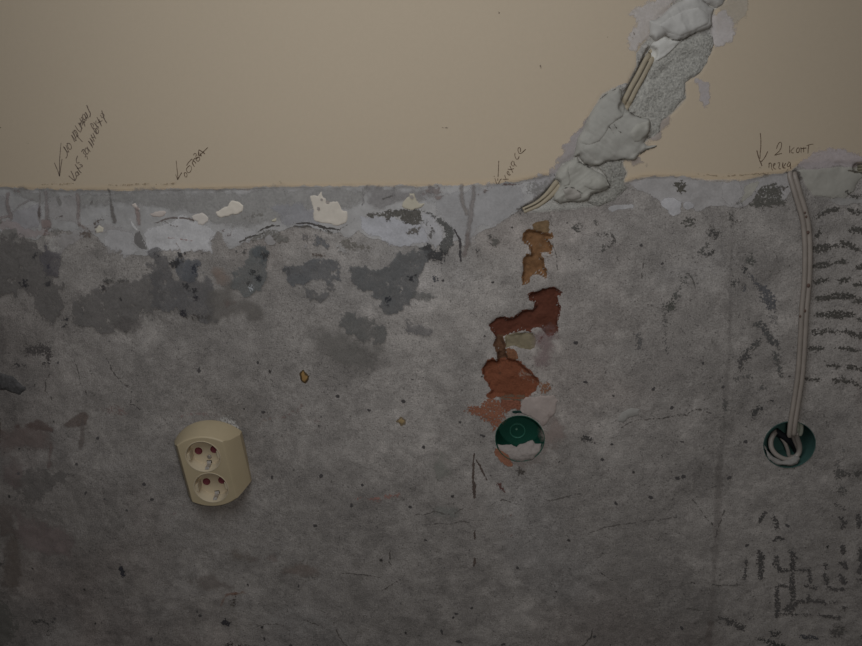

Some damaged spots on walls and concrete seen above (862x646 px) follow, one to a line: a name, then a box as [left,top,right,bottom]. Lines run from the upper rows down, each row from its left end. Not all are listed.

peeling [0,179,551,264]
peeling [630,173,791,216]
water stain [0,233,269,334]
water stain [282,247,433,315]
water stain [339,312,387,345]
spalling [459,220,563,443]
spalling [494,448,525,476]